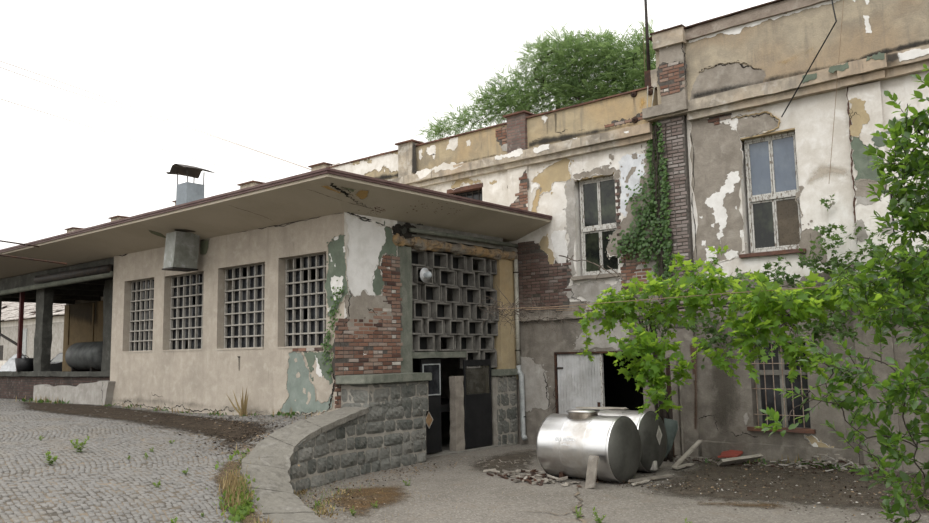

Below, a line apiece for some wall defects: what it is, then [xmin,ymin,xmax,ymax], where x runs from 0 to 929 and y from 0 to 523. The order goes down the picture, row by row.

peeling [689,0,840,43]
peeling [853,0,872,33]
flaking render [657,60,766,100]
peeling [416,137,497,190]
peeling [495,126,549,160]
peeling [848,97,887,206]
crack [235,183,382,232]
flaking render [689,111,781,275]
flaking render [510,143,659,352]
flaking render [280,202,461,415]